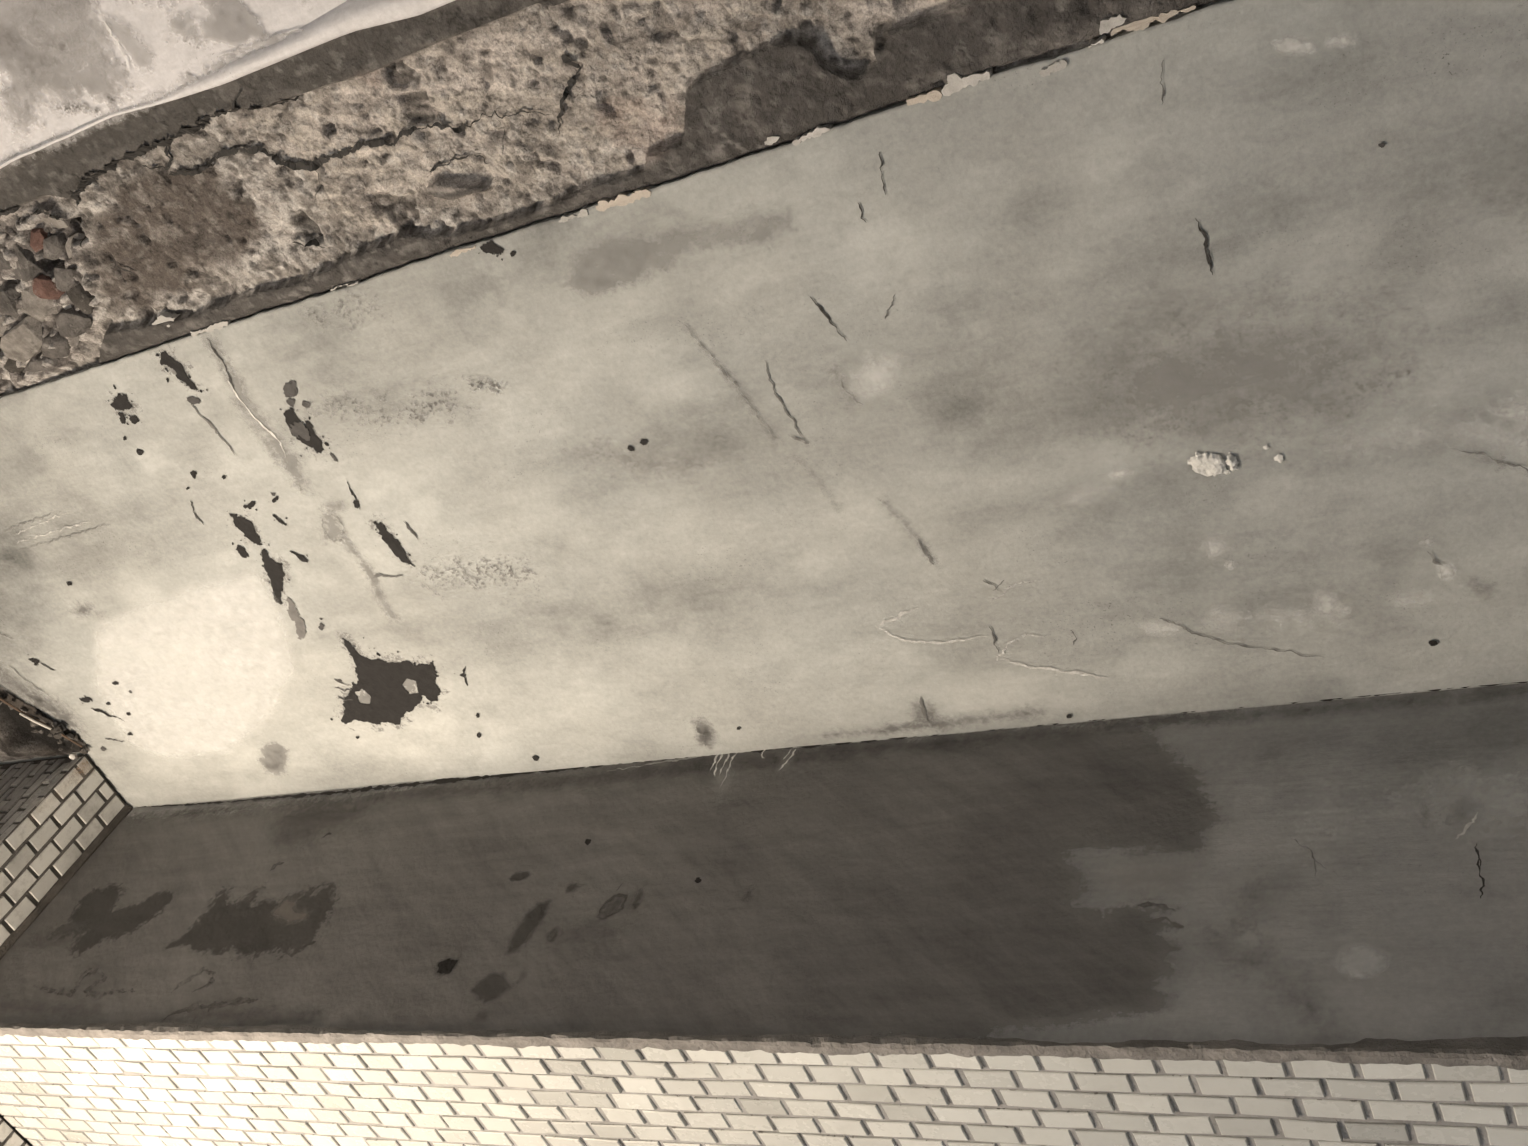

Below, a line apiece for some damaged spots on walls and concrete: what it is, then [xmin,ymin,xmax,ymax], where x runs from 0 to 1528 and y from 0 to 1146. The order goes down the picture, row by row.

crack [0,54,581,273]
spalling [0,0,1221,462]
crack [1195,218,1213,275]
spalling [0,681,133,762]
flaking render [227,493,324,640]
flaking render [330,632,448,739]
flaking render [347,482,536,589]
crack [138,681,1528,819]
crack [984,580,1004,653]
crack [1160,618,1322,657]
water stain [0,697,1220,1039]
crack [1456,812,1485,898]